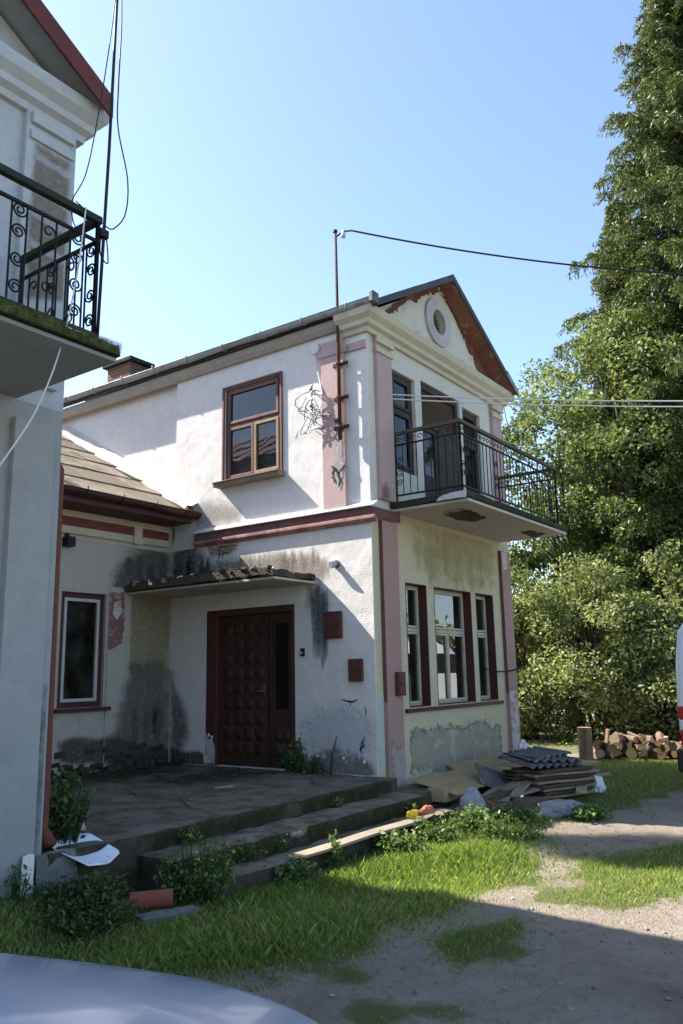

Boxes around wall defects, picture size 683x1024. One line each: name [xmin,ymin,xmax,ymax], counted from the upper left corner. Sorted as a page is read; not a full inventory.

flaking render [385,286,491,379]
spalling [437,490,486,523]
spalling [108,565,275,650]
water stain [115,548,328,663]
water stain [111,663,187,756]
flaking render [377,686,520,787]